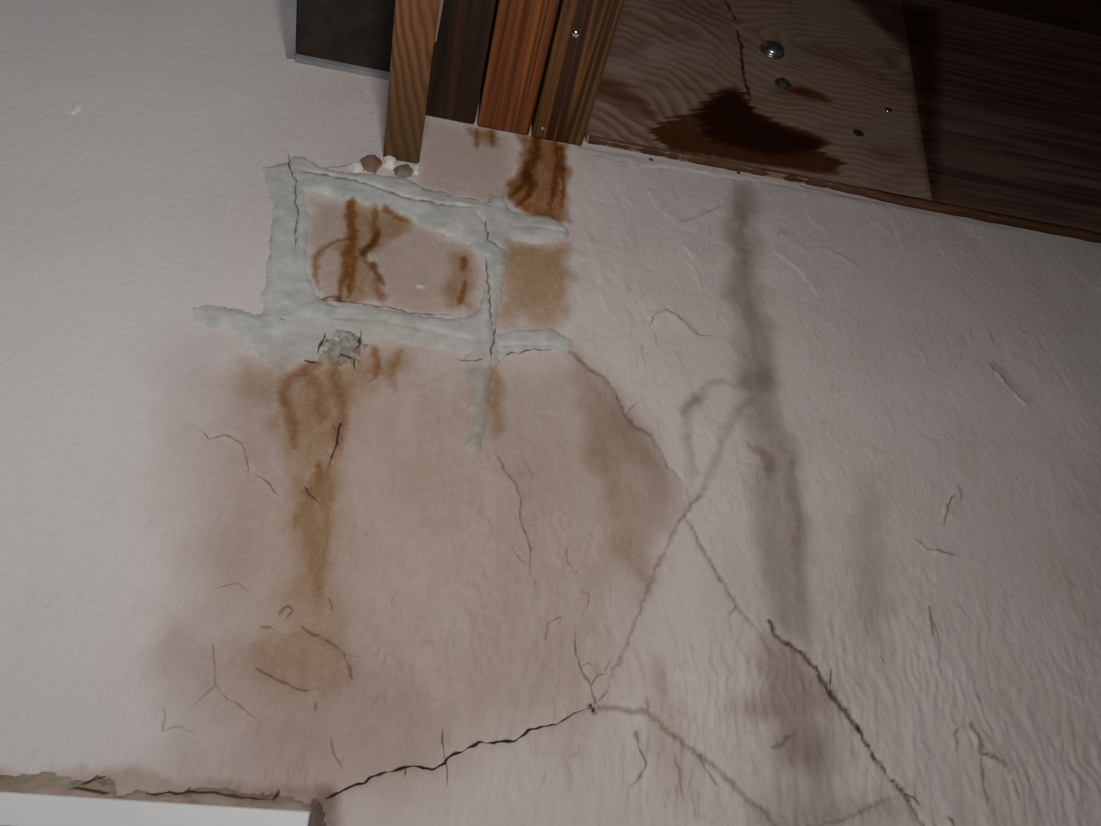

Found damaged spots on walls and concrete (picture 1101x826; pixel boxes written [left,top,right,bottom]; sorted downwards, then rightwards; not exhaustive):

damp [650,90,842,172]
spalling [349,154,420,178]
spalling [364,251,379,262]
spalling [318,329,368,368]
crack [331,705,594,797]
spalling [0,771,312,814]